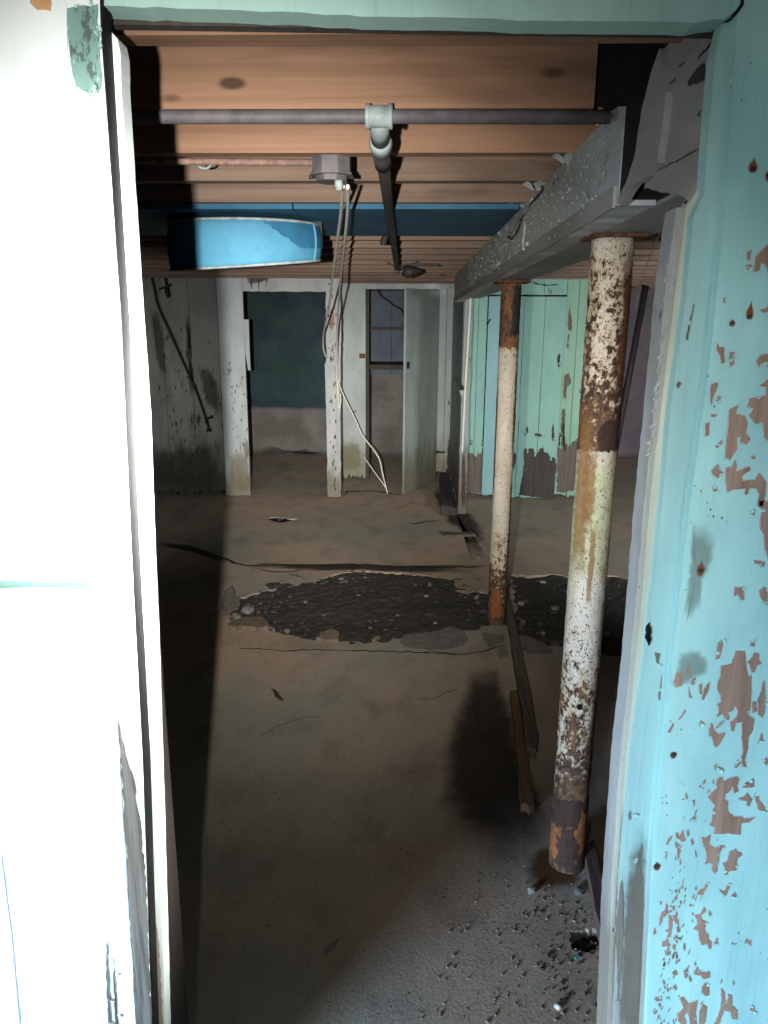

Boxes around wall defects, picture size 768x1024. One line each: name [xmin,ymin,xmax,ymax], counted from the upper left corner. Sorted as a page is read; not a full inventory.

peeling [67,0,103,101]
water stain [152,318,165,370]
water stain [186,325,218,408]
corrosion [509,284,522,336]
peeling [513,306,581,499]
corrosion [616,274,632,382]
water stain [159,449,212,485]
corrosion [573,407,622,593]
peeling [704,353,768,568]
crack [186,546,483,616]
corrosion [529,794,590,886]
peeling [655,638,768,950]